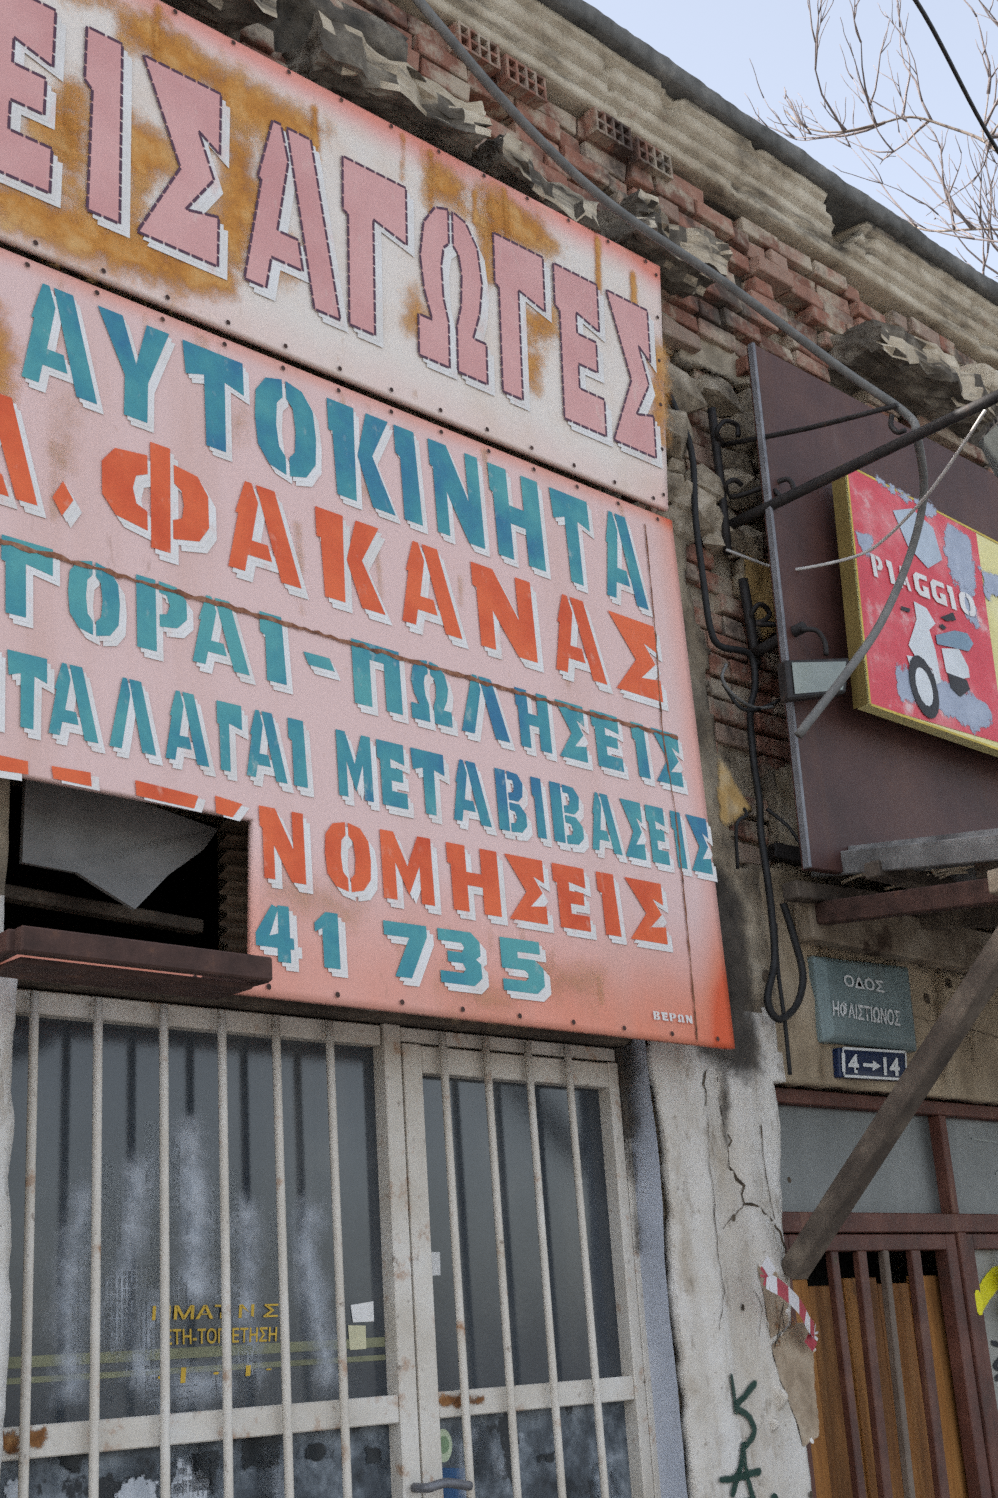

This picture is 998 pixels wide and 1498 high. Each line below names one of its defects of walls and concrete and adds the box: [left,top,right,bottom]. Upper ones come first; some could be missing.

crack [703,1070,787,1348]